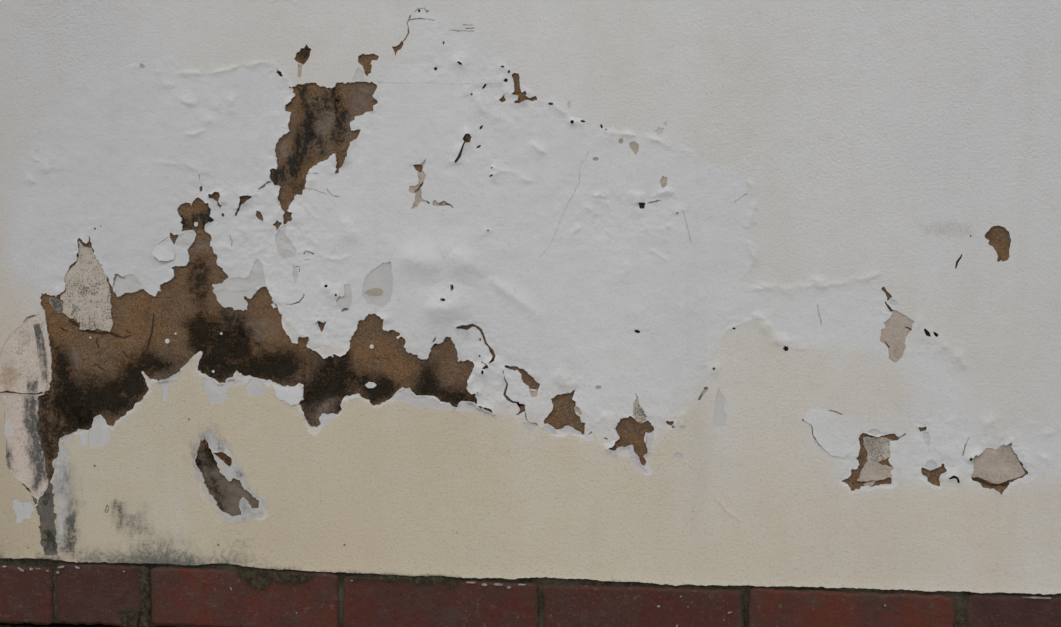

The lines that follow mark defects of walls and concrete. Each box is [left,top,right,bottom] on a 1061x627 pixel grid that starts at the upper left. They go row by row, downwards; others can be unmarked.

peeling [985,225,1011,262]
peeling [0,45,493,555]
peeling [880,287,914,363]
peeling [503,365,592,435]
peeling [604,393,654,473]
peeling [842,429,906,491]
peeling [918,427,931,446]
peeling [921,460,947,486]
peeling [970,443,1028,494]